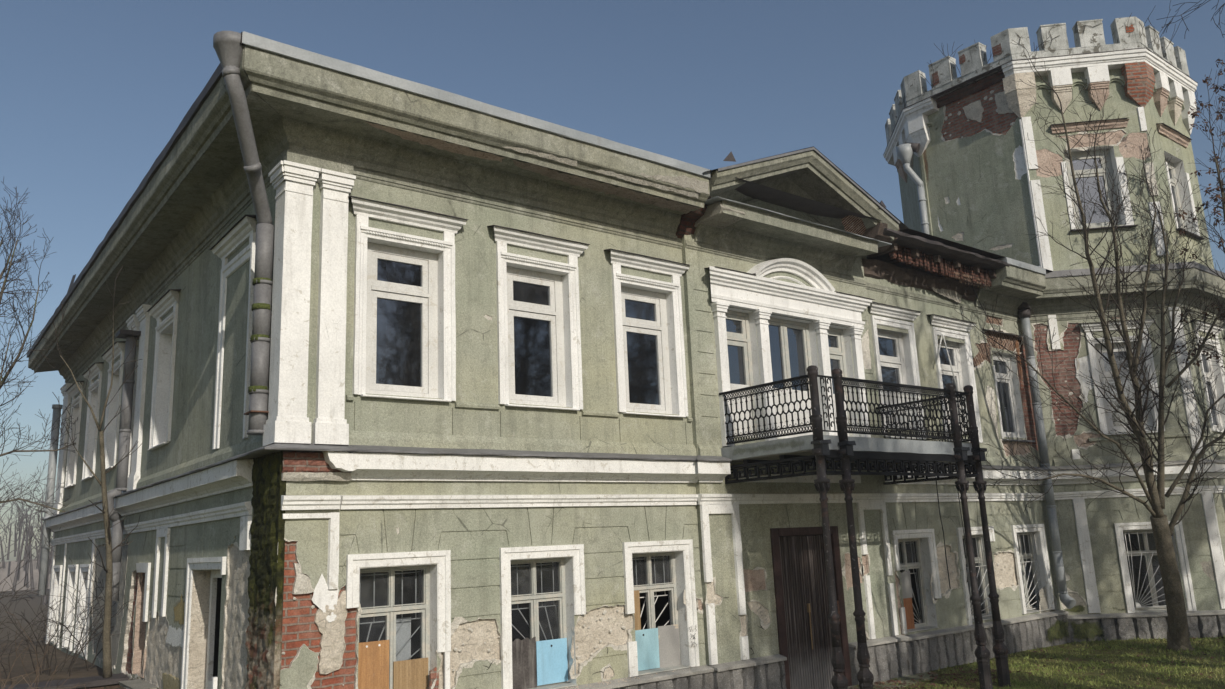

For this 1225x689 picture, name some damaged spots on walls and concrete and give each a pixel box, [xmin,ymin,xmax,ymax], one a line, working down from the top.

flaking render [940,81,1018,141]
flaking render [367,122,745,238]
flaking render [1013,129,1151,180]
flaking render [973,315,1101,457]
flaking render [91,538,184,689]
flaking render [221,542,251,689]
flaking render [275,538,362,689]
flaking render [429,617,501,689]
flaking render [569,605,635,681]
flaking render [739,567,771,637]
flaking render [842,552,870,591]
flaking render [993,550,1019,591]